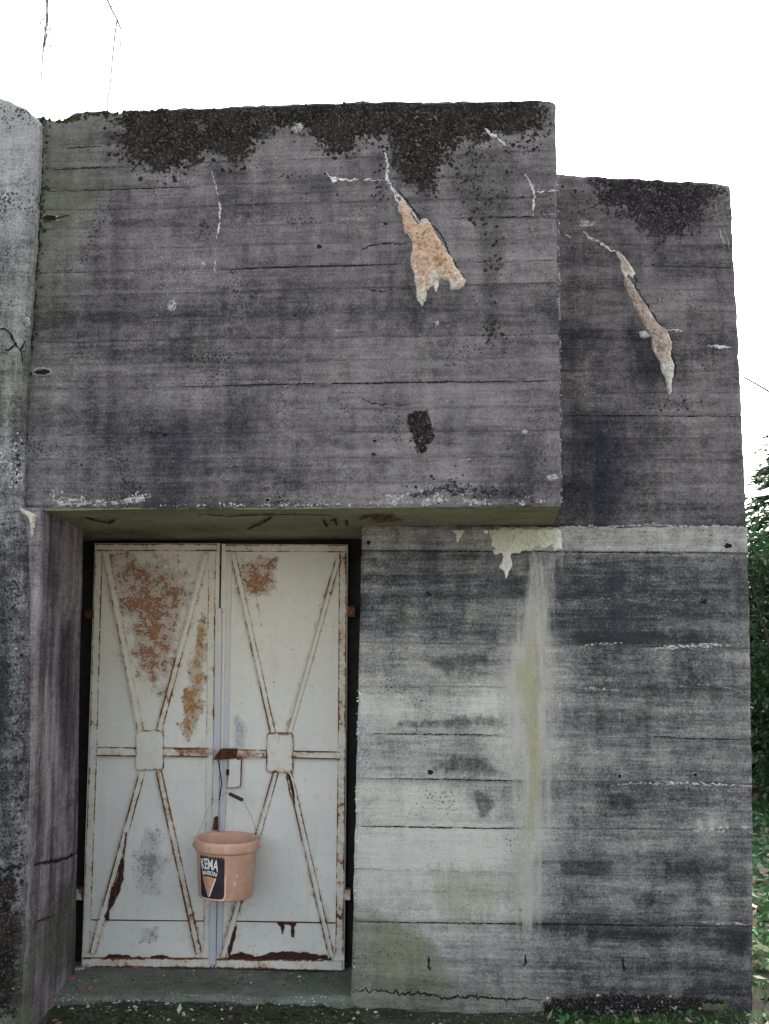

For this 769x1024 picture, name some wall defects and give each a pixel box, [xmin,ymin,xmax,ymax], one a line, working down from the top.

crack [454,174,559,219]
crack [0,116,420,405]
spalling [396,187,466,306]
spalling [616,251,677,395]
rust [240,556,277,607]
rust [108,551,215,758]
water stain [484,527,563,931]
rust [104,832,135,921]
rust [227,926,332,960]
rust [277,923,296,937]
crack [352,987,542,1001]